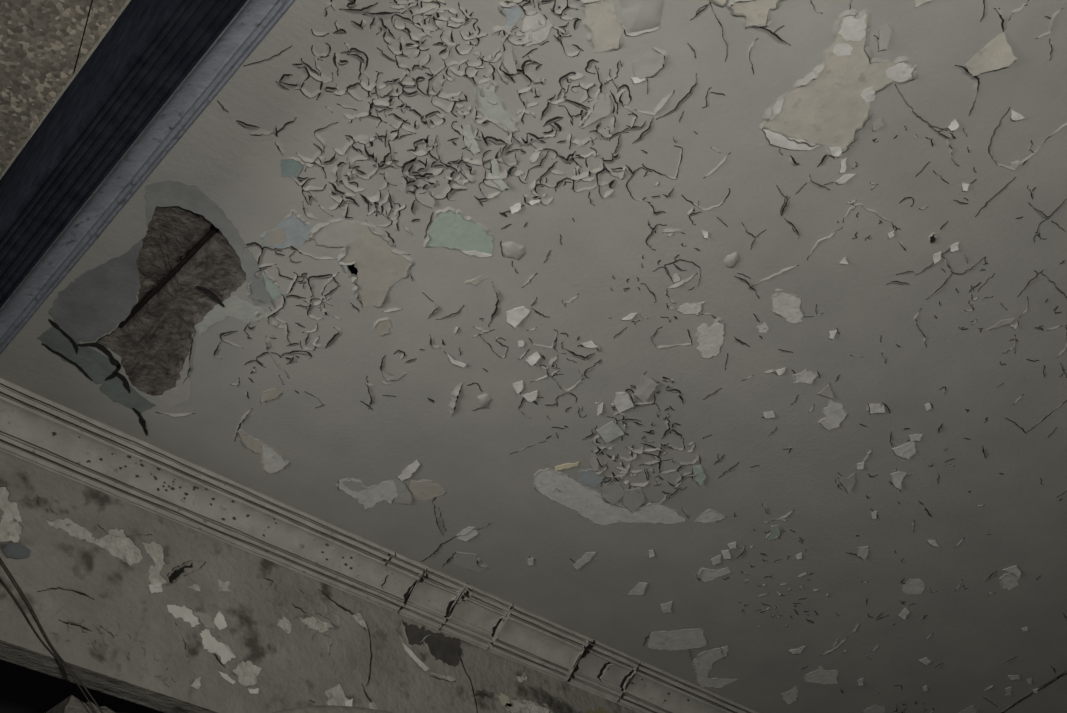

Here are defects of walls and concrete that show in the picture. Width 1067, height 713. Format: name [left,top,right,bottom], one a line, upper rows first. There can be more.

peeling [708,0,785,29]
peeling [236,117,305,178]
peeling [460,78,558,190]
peeling [758,8,920,184]
spalling [37,180,550,436]
peeling [533,372,726,526]
peeling [764,367,849,430]
peeling [336,460,491,562]
peeling [0,486,263,694]
peeling [263,577,368,655]
peeling [309,682,353,707]
peeling [643,628,739,688]